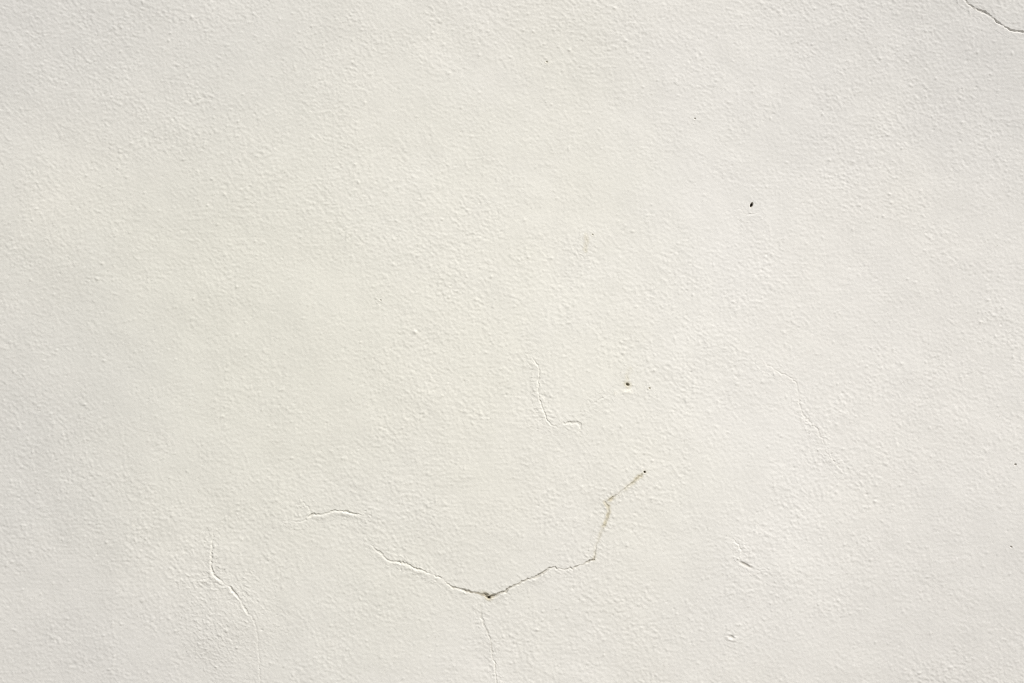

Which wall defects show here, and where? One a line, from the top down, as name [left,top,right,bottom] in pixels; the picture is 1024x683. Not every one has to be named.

crack [955,0,1024,40]
crack [283,466,651,683]